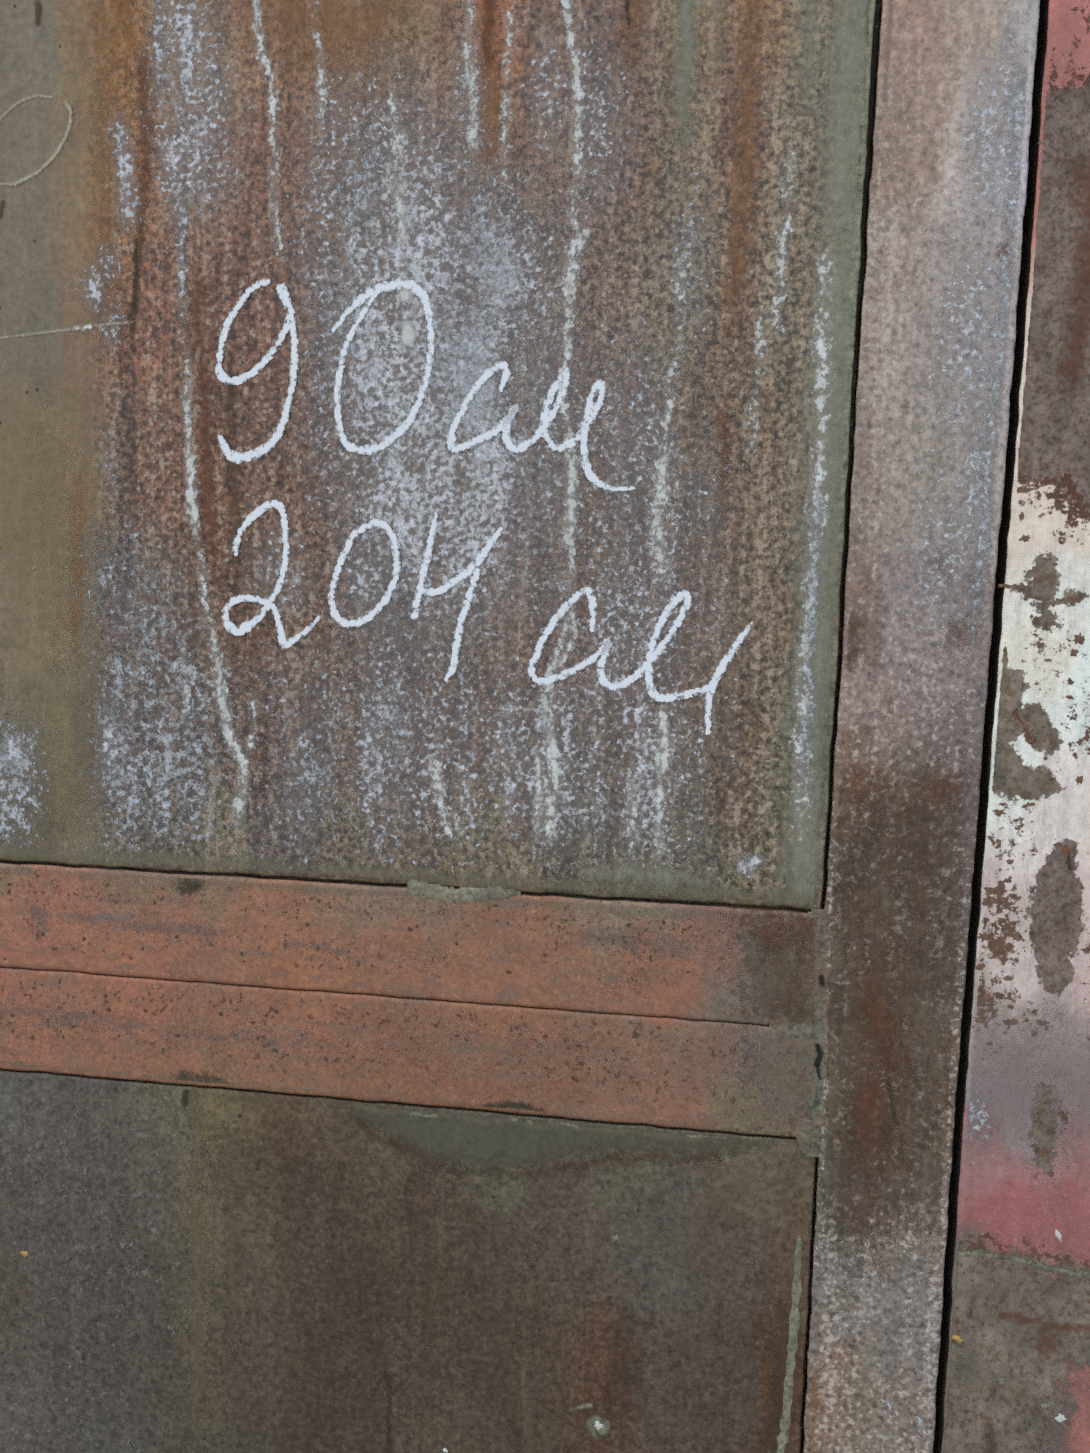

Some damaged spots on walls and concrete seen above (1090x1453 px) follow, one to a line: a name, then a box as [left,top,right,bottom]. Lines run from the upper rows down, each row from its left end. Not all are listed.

corrosion [118,59,151,336]
corrosion [197,369,239,562]
peeling [974,512,1090,1073]